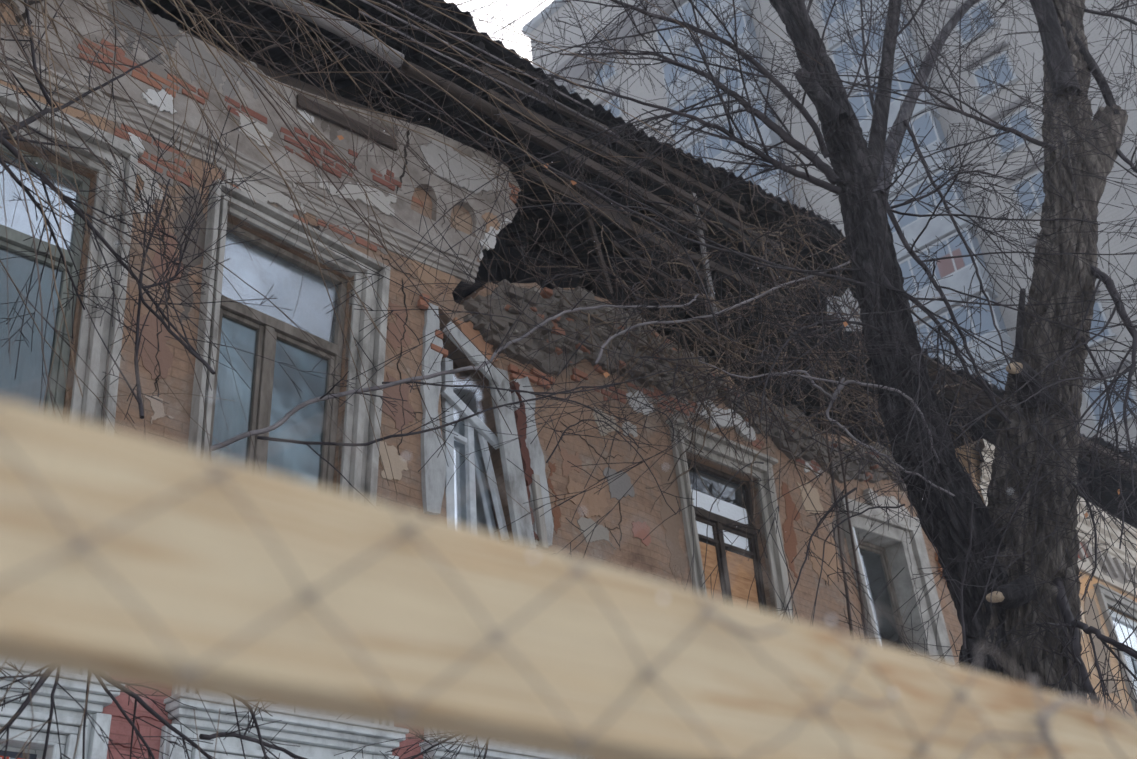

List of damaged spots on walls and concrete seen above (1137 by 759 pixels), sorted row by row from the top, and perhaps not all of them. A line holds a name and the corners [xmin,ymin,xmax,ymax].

flaking render [0,80,194,287]
flaking render [221,169,388,255]
flaking render [224,96,402,217]
flaking render [451,212,512,261]
spalling [382,372,415,431]
peeling [379,441,409,481]